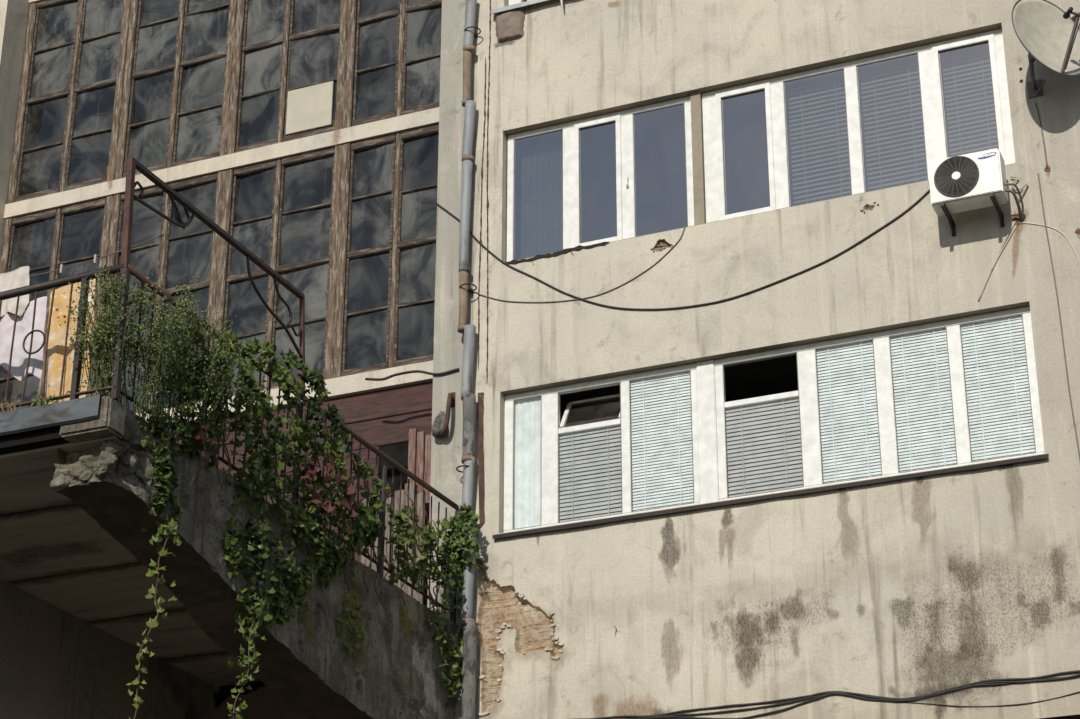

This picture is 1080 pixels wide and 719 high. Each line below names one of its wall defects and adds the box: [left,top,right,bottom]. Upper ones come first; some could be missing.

spalling [650,239,673,252]
spalling [50,441,138,491]
water stain [662,520,679,568]
water stain [1018,548,1063,627]
spalling [476,558,564,716]
water stain [735,598,803,677]
water stain [919,603,992,683]